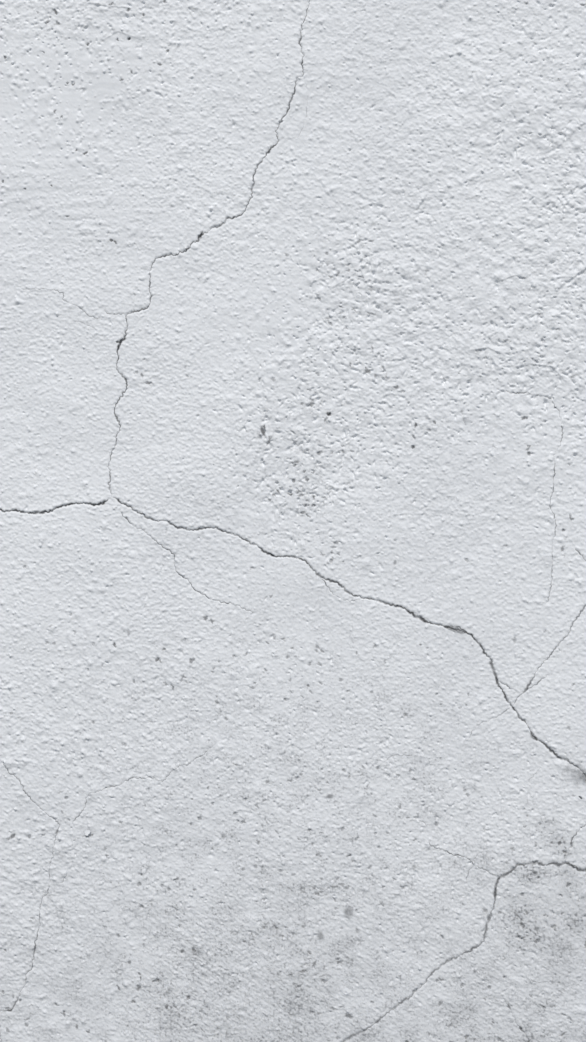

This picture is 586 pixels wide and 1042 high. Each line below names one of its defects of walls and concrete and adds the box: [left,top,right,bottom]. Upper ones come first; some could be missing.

crack [0,6,579,768]
crack [464,862,584,953]